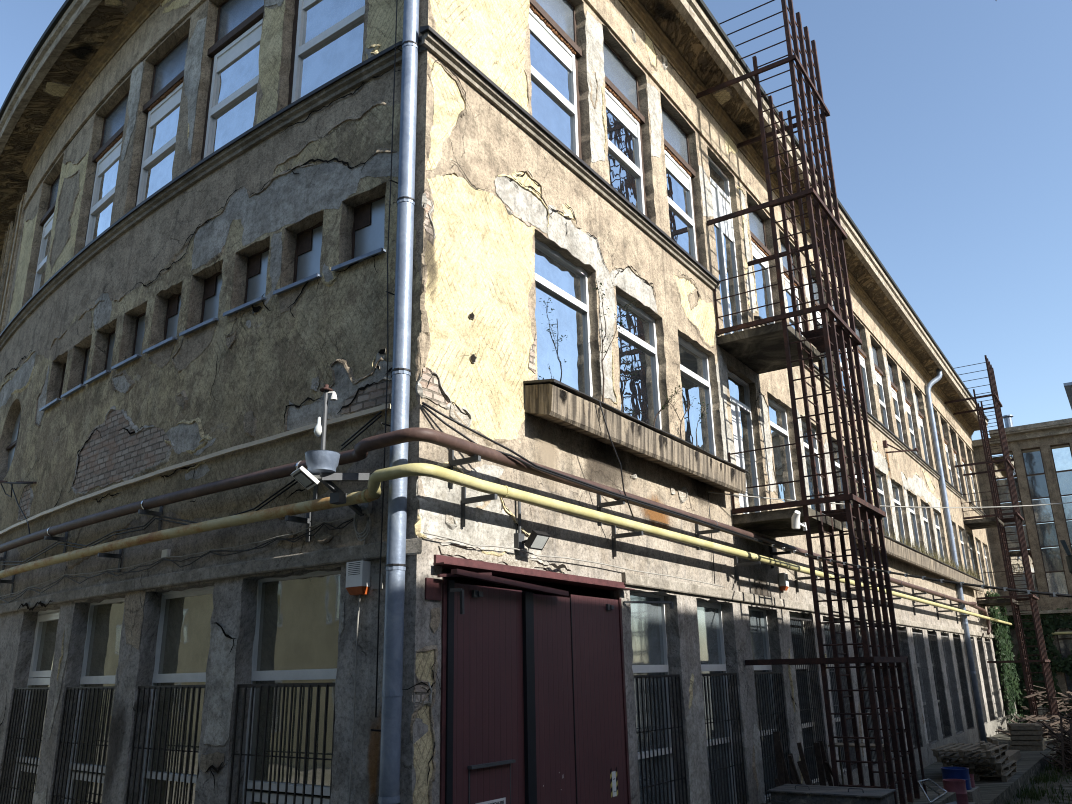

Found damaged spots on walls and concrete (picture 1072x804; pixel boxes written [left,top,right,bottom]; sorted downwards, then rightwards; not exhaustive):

flaking render [43,81,72,99]
flaking render [121,62,144,161]
flaking render [429,0,530,112]
crack [130,156,372,294]
flaking render [409,57,658,446]
flaking render [0,101,401,569]
flaking render [414,461,566,573]
crack [205,762,223,788]
flaking render [410,645,439,804]